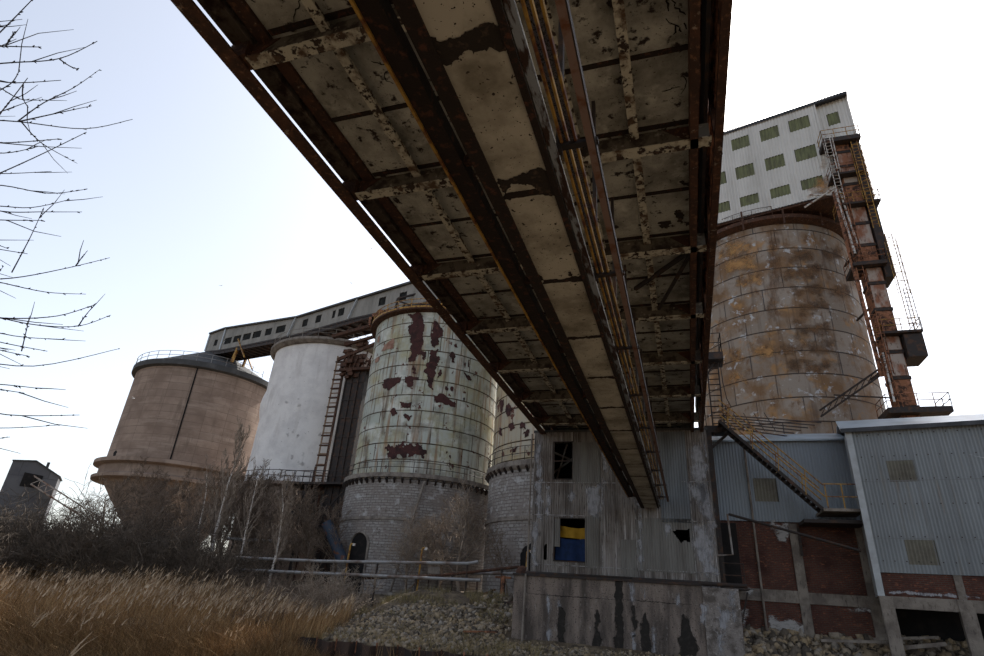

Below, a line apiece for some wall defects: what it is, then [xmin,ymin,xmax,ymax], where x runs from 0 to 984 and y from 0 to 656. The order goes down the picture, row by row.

spalling [431,22,513,66]
peeling [382,312,472,407]
peeling [390,402,412,421]
peeling [499,400,529,437]
peeling [385,441,427,459]
leakage [547,596,566,643]
leakage [592,581,655,653]